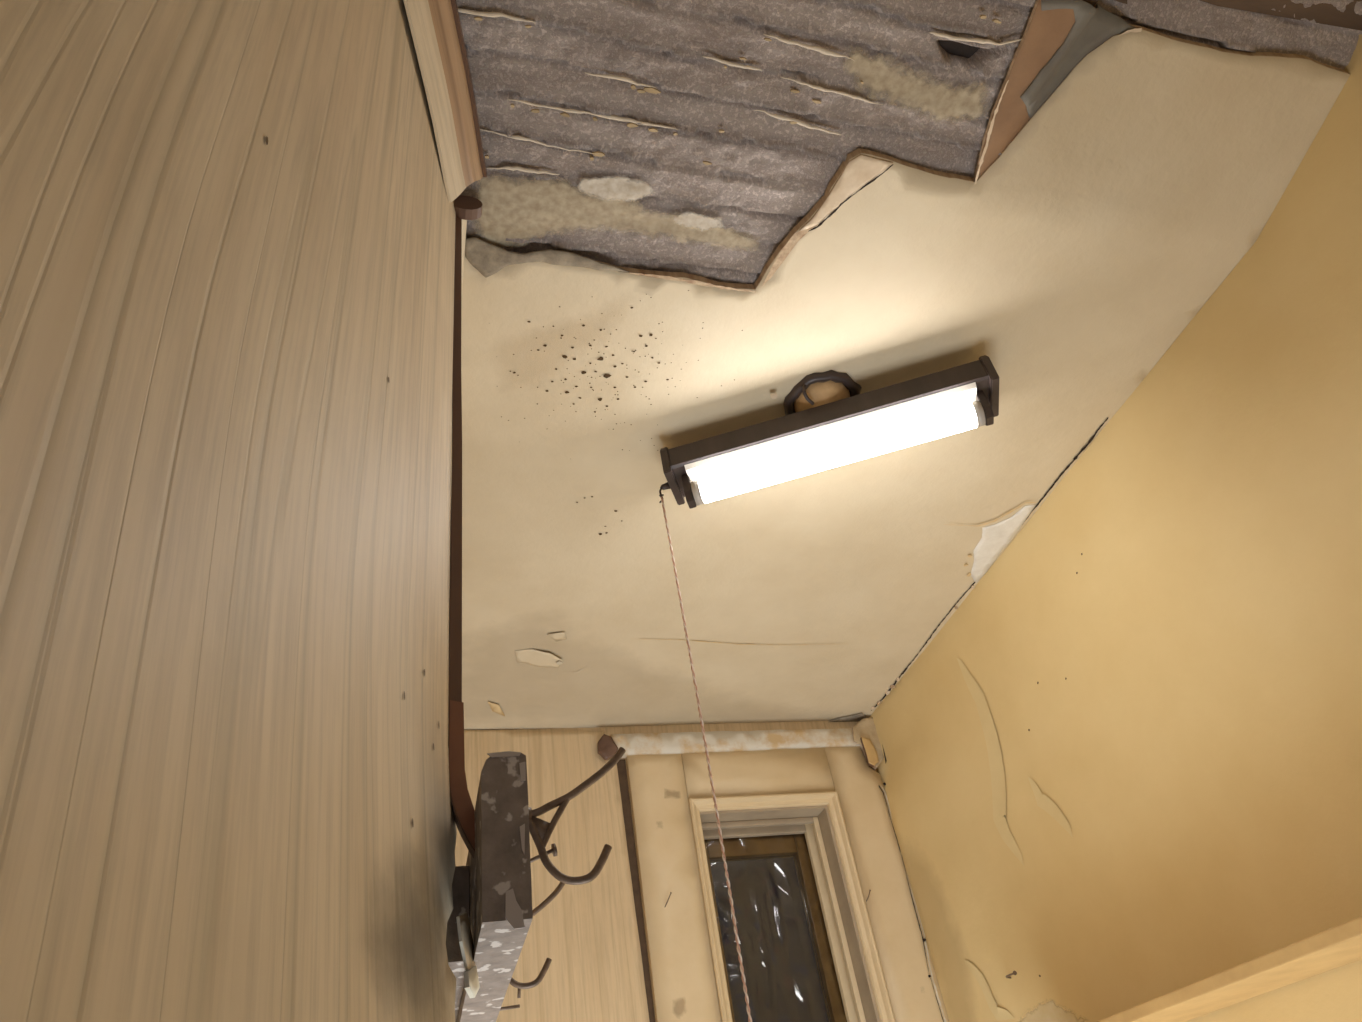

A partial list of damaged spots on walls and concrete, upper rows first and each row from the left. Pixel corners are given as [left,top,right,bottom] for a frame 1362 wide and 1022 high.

spalling [456,0,1362,284]
water stain [527,313,699,430]
peeling [944,502,1036,583]
peeling [515,632,589,673]